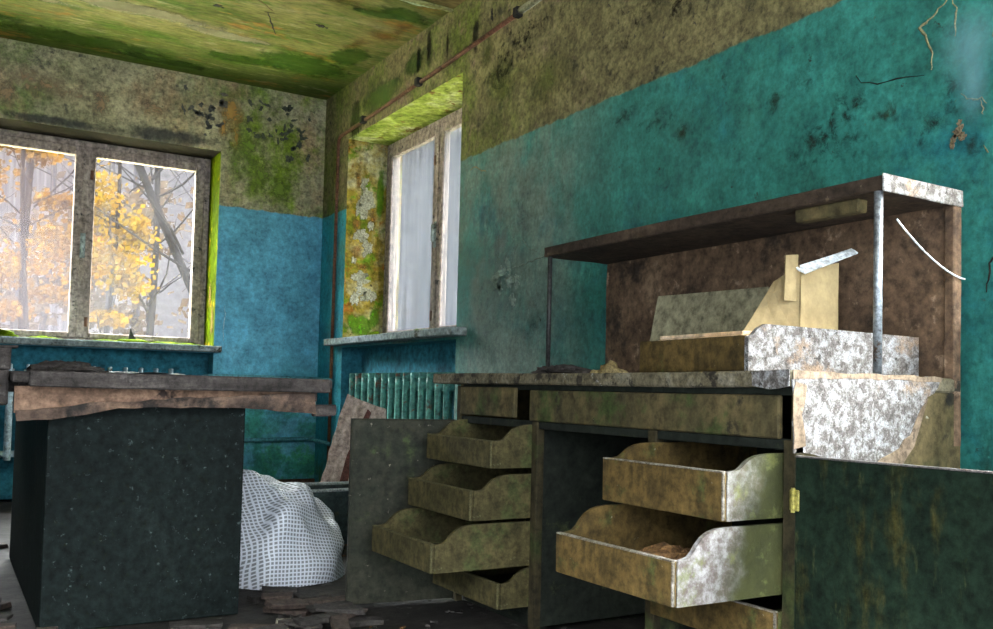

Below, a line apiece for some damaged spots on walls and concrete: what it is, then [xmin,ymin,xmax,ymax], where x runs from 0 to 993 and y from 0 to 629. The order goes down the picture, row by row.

leakage [41,0,271,45]
leakage [417,34,431,71]
crack [961,93,987,114]
crack [985,257,993,292]